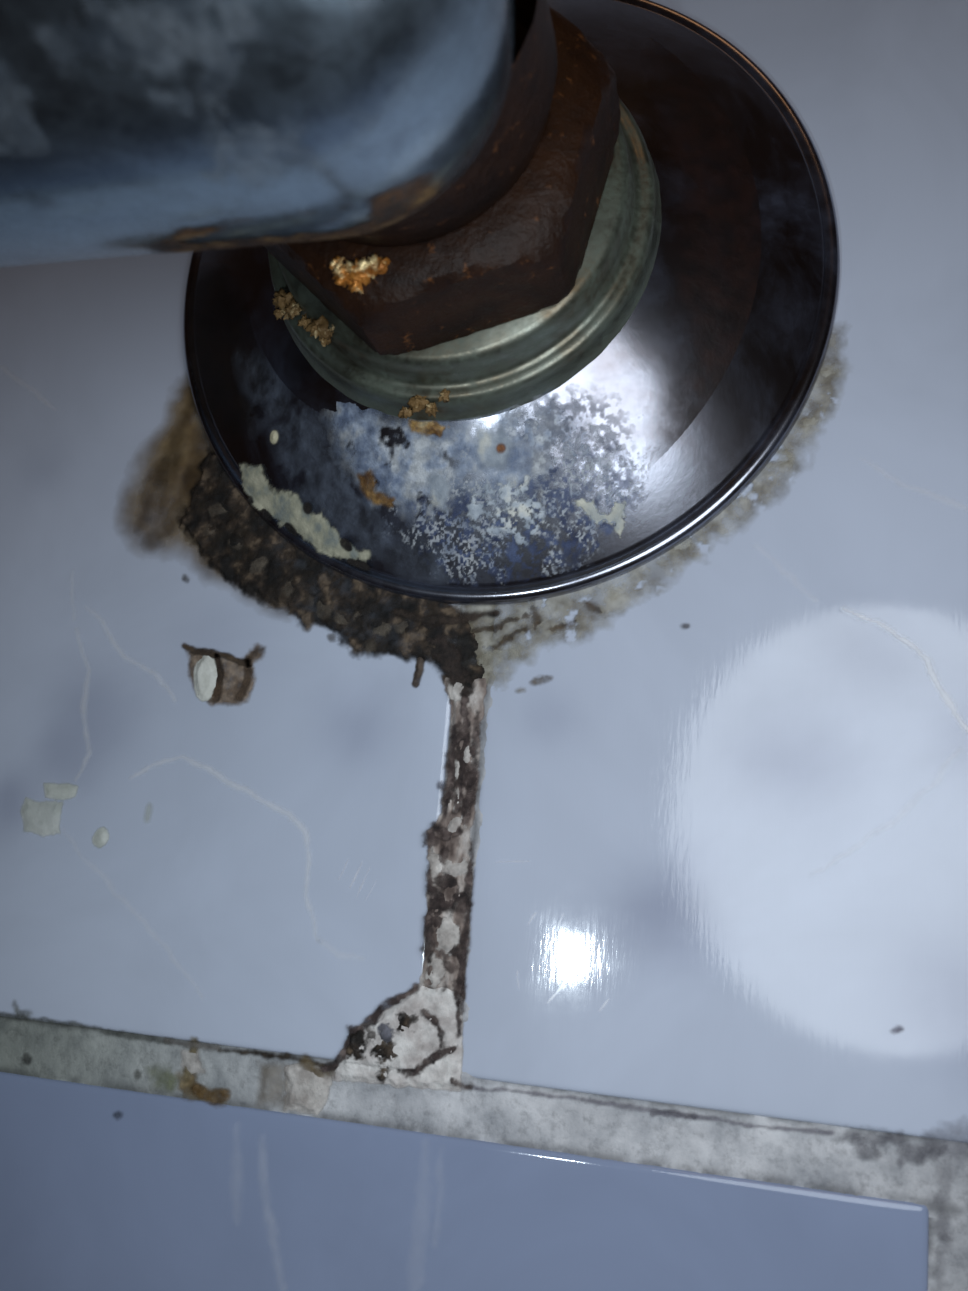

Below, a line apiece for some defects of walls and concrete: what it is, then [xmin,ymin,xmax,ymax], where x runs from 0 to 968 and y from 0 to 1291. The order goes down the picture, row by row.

leakage [179,451,500,696]
leakage [442,768,478,803]
leakage [423,828,467,930]